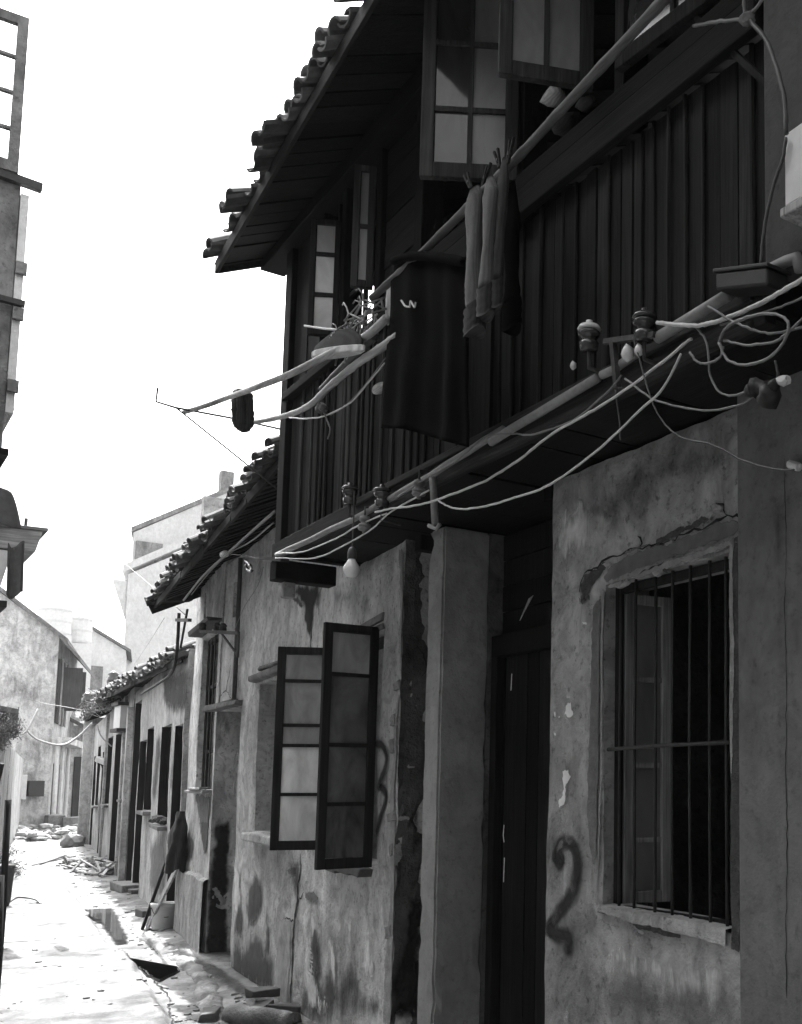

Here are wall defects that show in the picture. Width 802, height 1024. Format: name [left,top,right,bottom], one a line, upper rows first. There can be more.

crack [579,503,738,600]
spalling [625,503,724,554]
peeling [558,770,571,807]
peeling [578,536,740,952]
spalling [383,669,410,1024]
damp [293,915,377,1024]